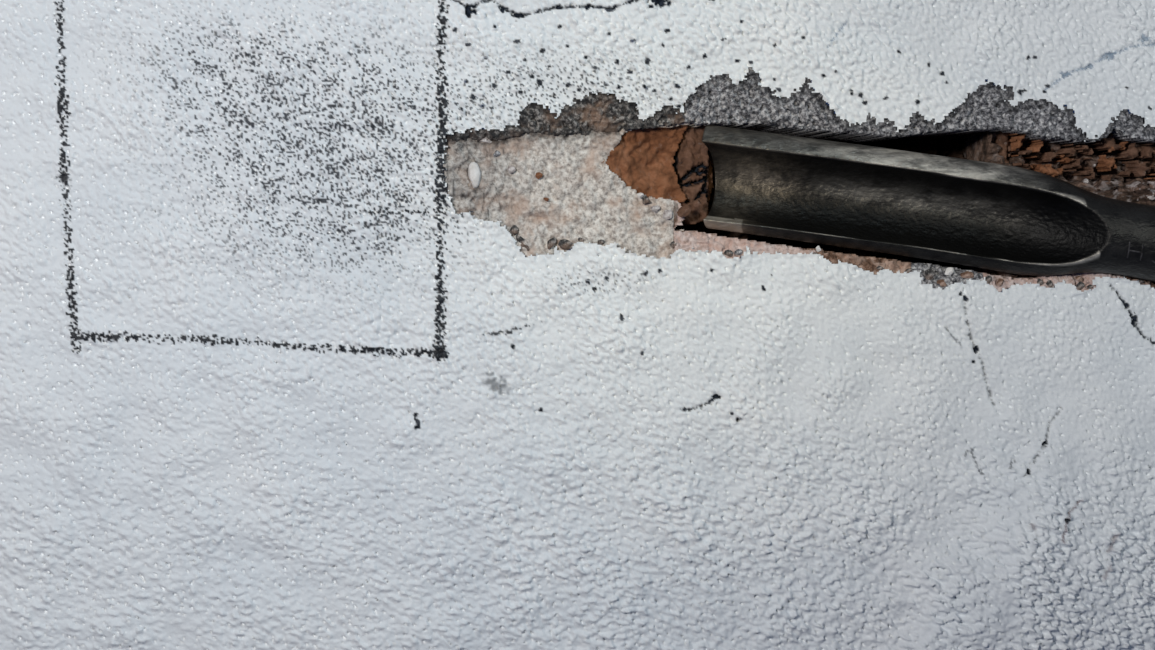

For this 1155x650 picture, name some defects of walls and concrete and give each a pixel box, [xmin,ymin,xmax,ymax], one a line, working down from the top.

crack [453,0,671,18]
crack [1056,34,1154,82]
spalling [441,56,1155,292]
crack [1110,285,1155,344]